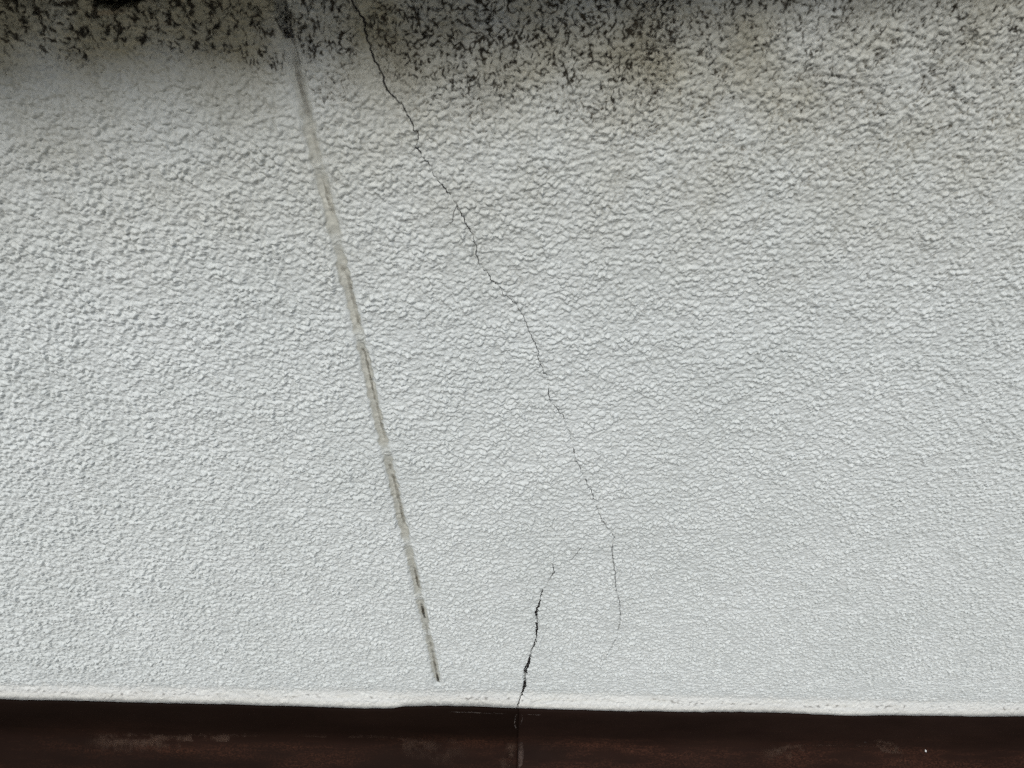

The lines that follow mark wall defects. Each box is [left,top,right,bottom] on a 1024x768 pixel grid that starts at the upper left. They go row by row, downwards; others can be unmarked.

water stain [0,0,357,69]
water stain [366,0,1023,121]
crack [351,0,564,417]
crack [517,567,555,705]